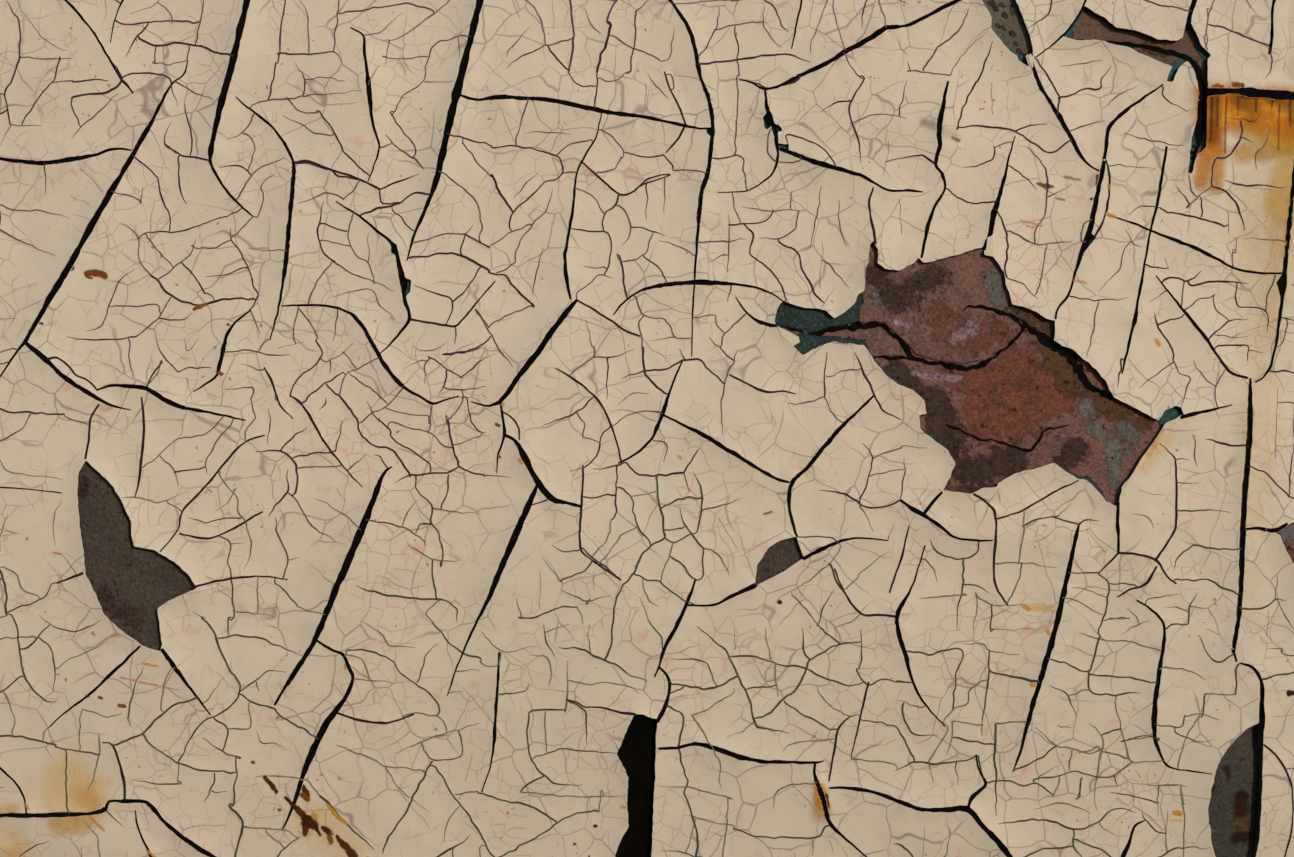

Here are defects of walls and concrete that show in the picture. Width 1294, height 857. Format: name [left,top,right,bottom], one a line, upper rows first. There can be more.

peeling [982,0,1034,68]
rust [1197,82,1294,218]
crack [1116,120,1294,419]
crack [0,0,961,857]
peeling [775,235,1182,506]
peeling [78,461,197,651]
peeling [754,537,804,586]
peeling [1276,522,1294,563]
rust [251,761,358,857]
peeling [615,714,659,857]
peeling [1208,724,1260,857]